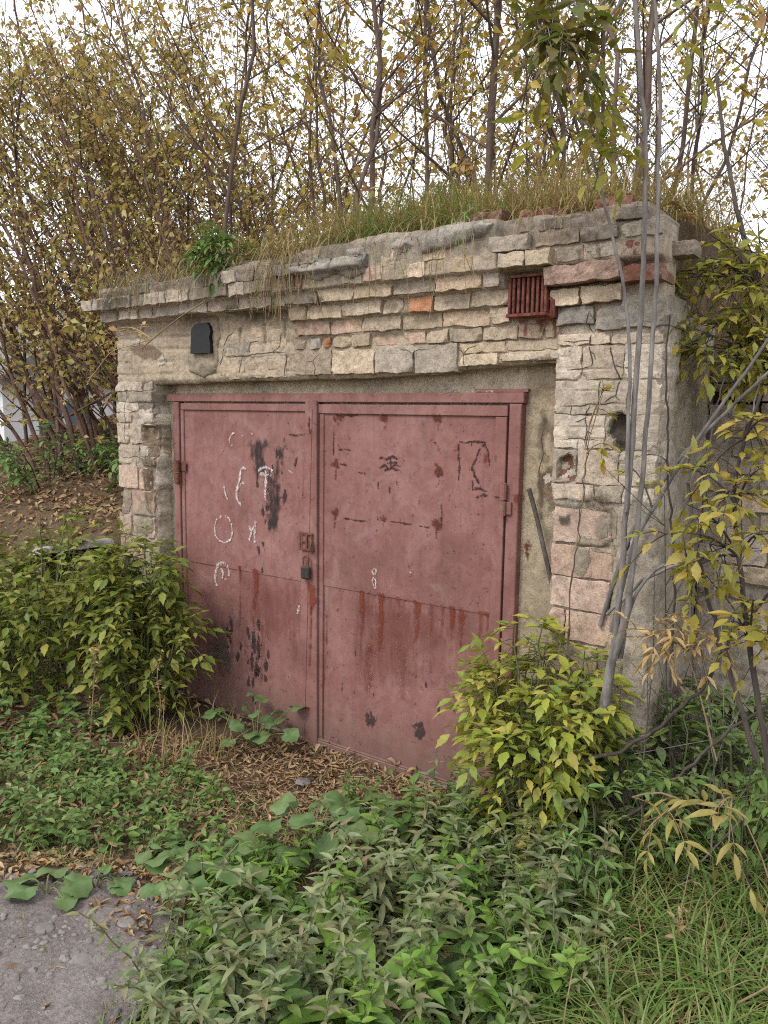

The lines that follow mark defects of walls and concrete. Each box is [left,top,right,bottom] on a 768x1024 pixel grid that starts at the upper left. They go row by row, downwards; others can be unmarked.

spalling [607,409,631,462]
peeling [256,438,287,523]
spalling [543,455,577,525]
spalling [574,506,617,577]
rust [413,600,463,646]
peeling [225,617,271,702]
peeling [412,721,425,740]